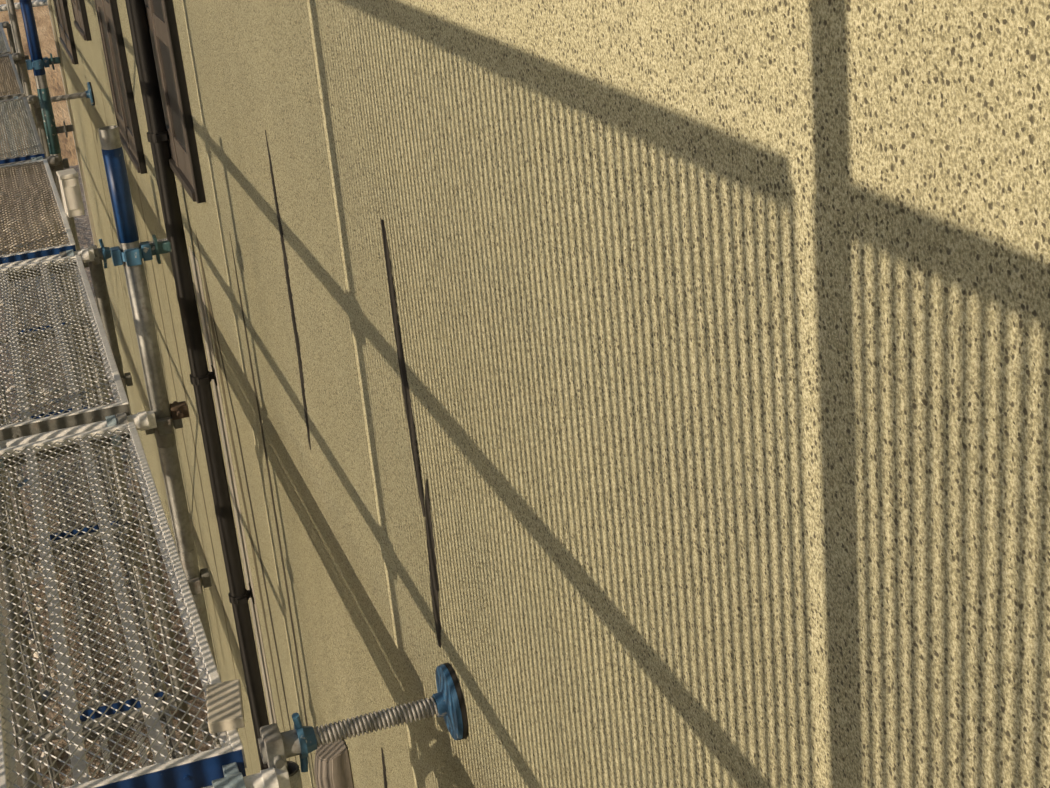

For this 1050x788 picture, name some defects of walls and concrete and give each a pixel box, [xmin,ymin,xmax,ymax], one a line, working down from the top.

crack [134,166,236,677]
crack [195,230,308,732]
crack [265,130,311,450]
crack [381,220,441,648]
crack [380,748,388,788]